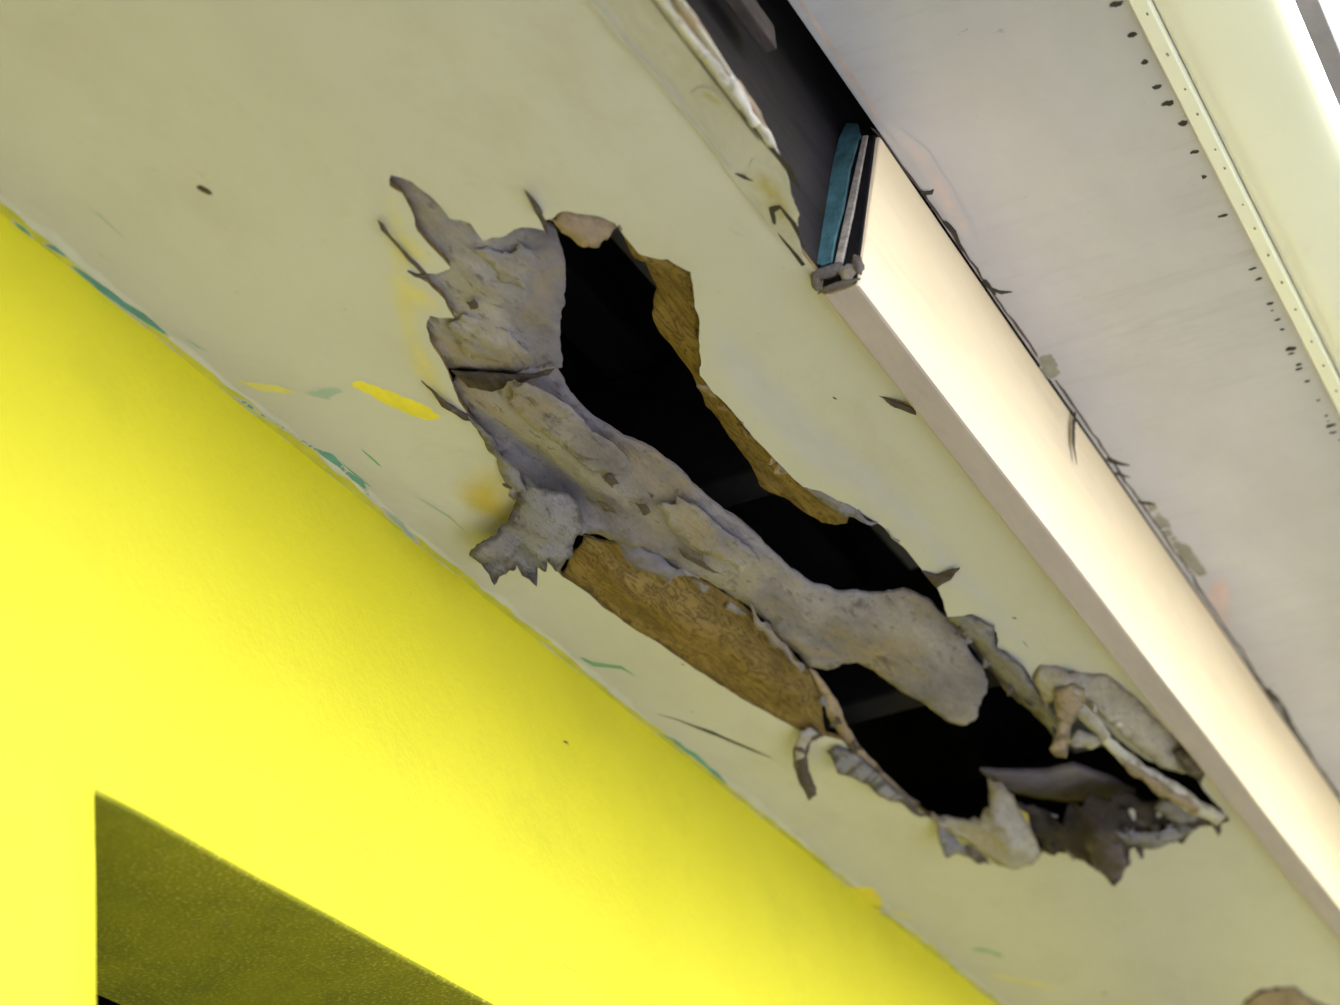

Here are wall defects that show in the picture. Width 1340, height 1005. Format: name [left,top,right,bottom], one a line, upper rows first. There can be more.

peeling [1037,352,1061,380]
spalling [596,473,619,513]
spalling [635,492,654,515]
peeling [1144,501,1209,580]
spalling [677,547,722,575]
peeling [1114,797,1201,850]
peeling [936,825,991,865]